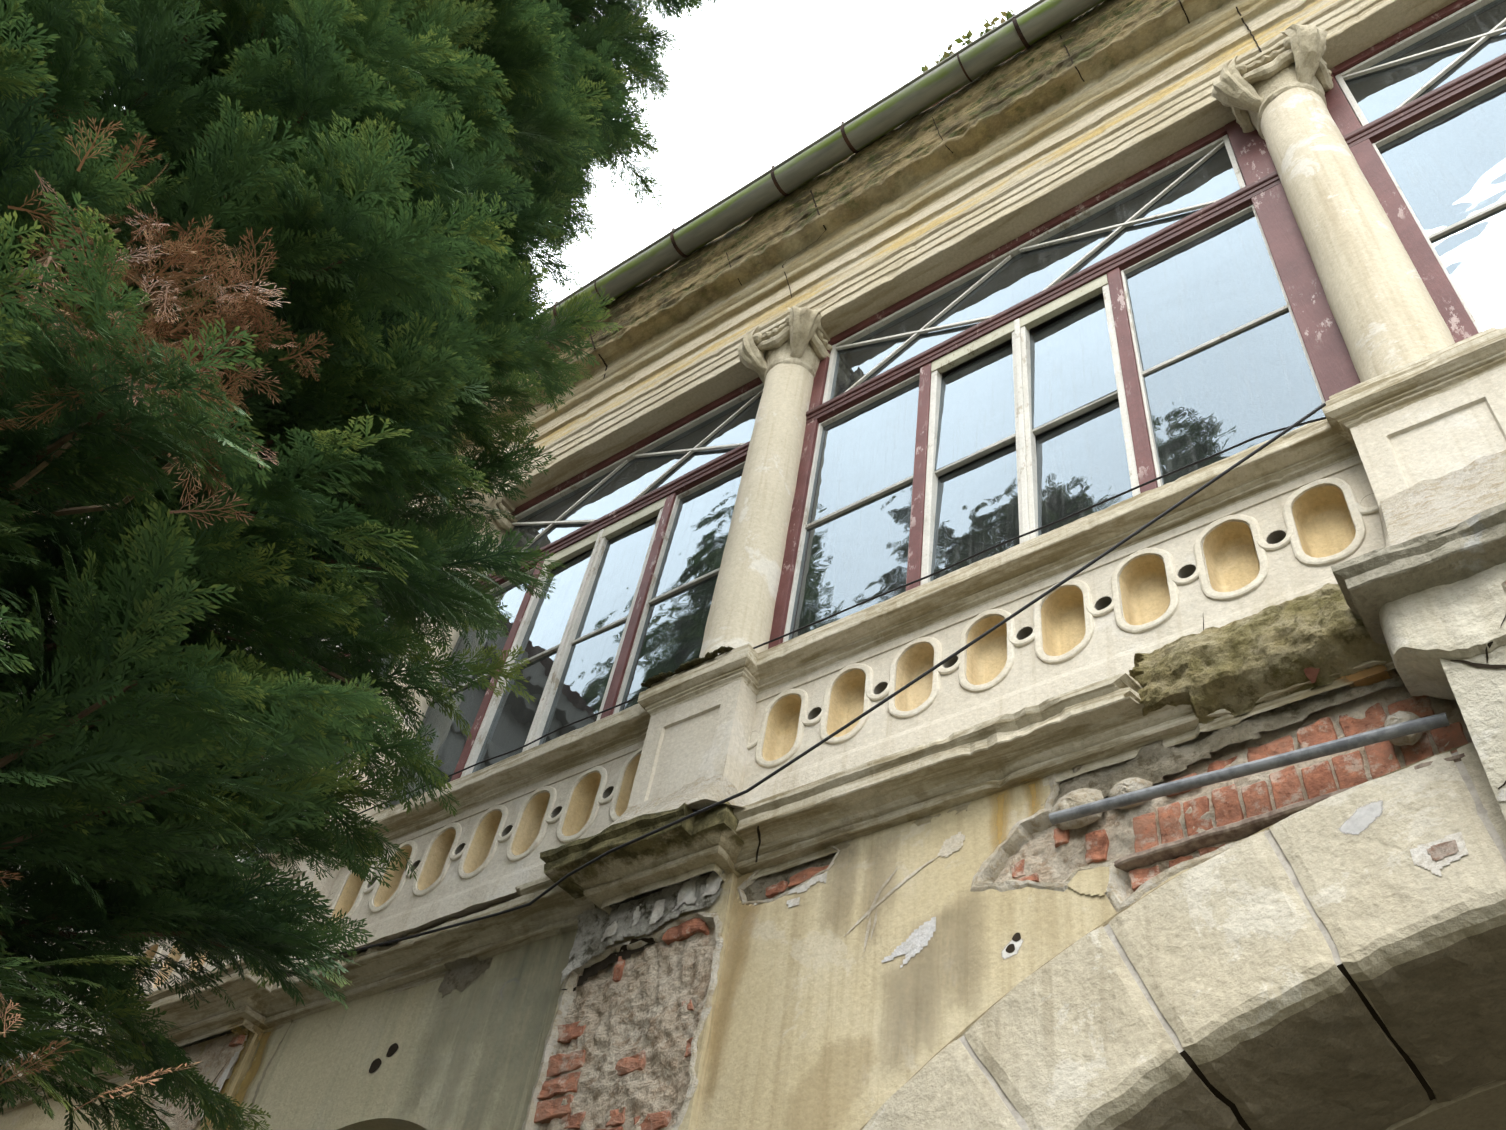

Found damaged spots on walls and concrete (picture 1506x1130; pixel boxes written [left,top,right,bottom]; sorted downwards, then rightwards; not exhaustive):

crack [1450,641,1506,669]
flaking render [970,668,1473,913]
flaking render [522,845,840,1130]